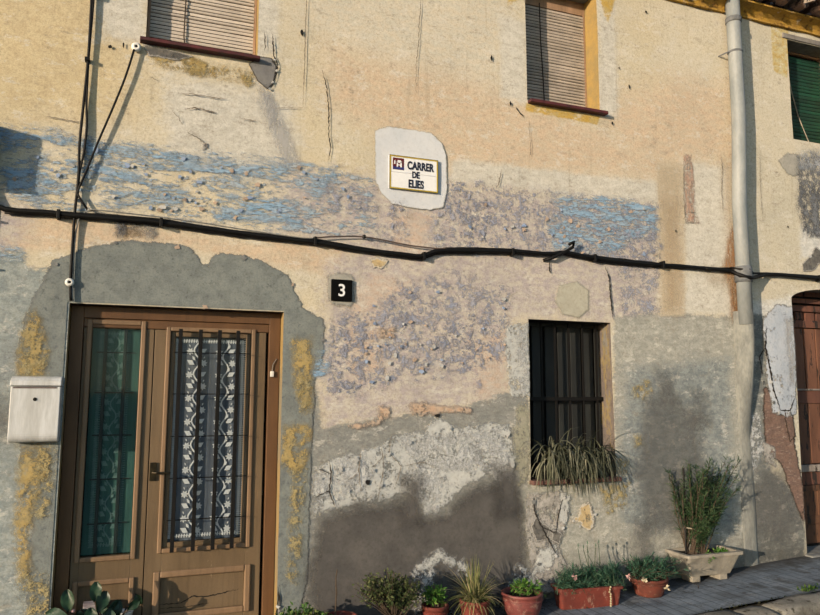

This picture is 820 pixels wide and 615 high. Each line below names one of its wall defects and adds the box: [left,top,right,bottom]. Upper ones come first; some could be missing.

crack [264,32,278,87]
crack [303,0,331,160]
peeling [0,127,408,243]
peeling [430,182,662,315]
spalling [802,247,820,272]
peeling [13,446,57,615]
crack [317,436,438,503]
peeling [291,273,530,486]
leakage [308,418,527,615]
crack [534,499,563,553]
spalling [508,490,597,593]
peeling [750,304,806,521]